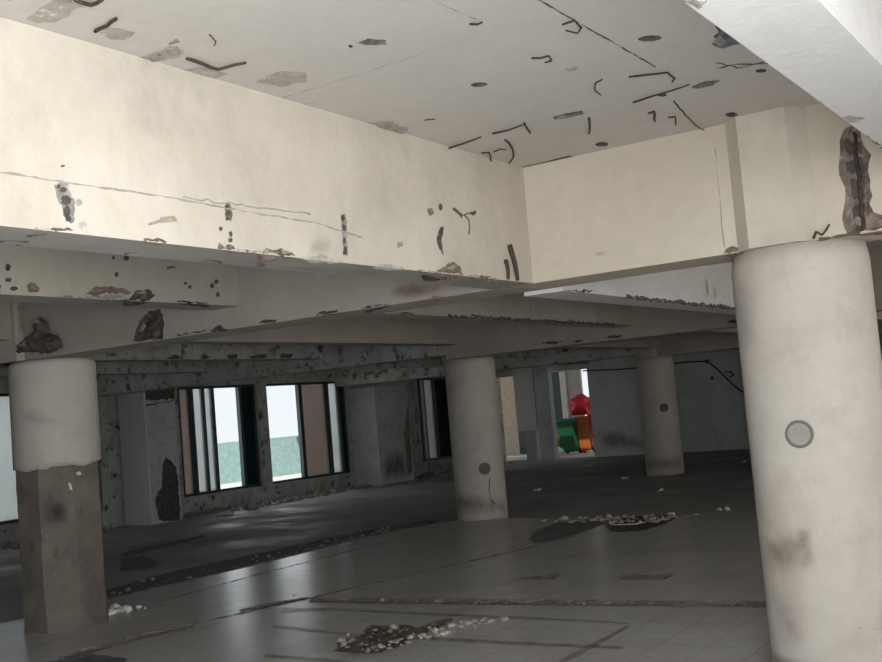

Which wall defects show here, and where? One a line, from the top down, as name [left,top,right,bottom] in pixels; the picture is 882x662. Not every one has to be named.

peeling [27,0,104,23]
spalling [712,26,741,49]
crack [715,61,768,69]
spalling [839,116,882,236]
spalling [35,182,87,234]
crack [0,172,362,238]
crack [0,234,47,246]
spalling [77,286,164,342]
spalling [155,457,181,521]